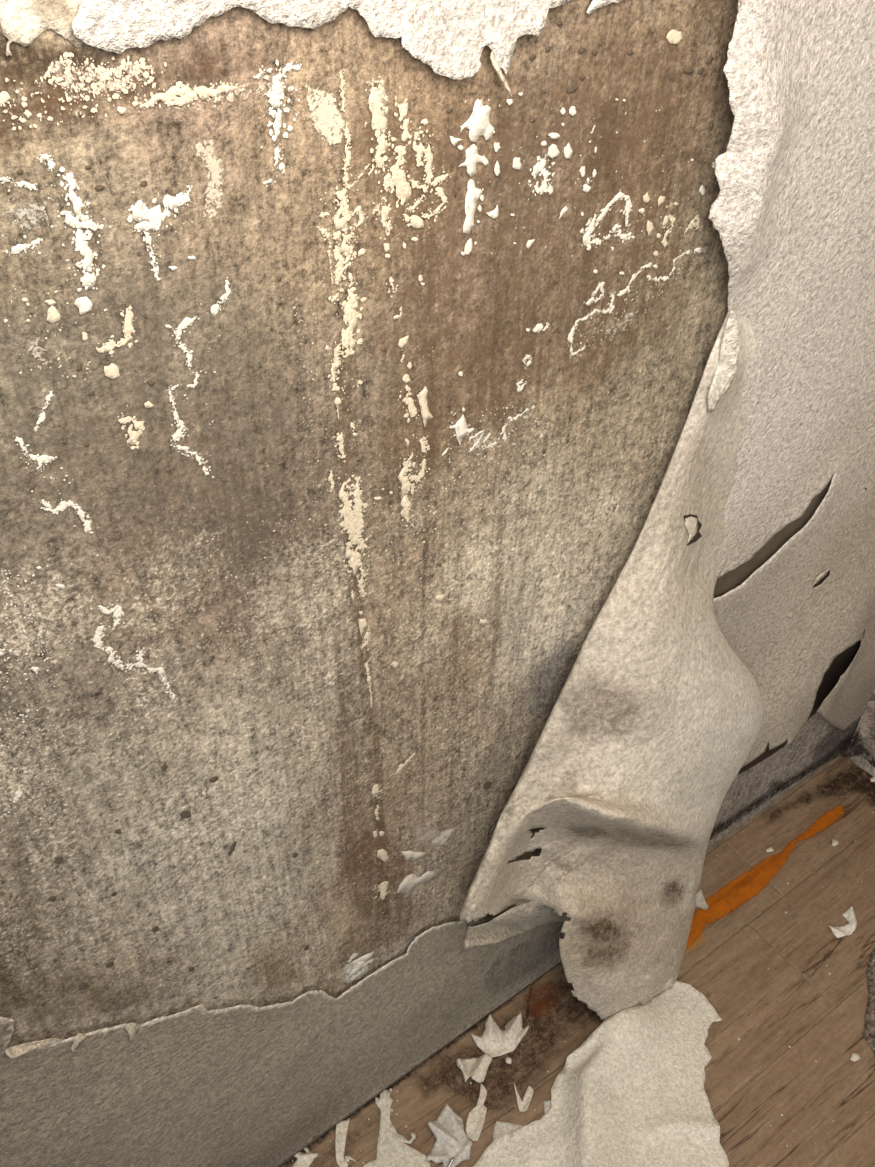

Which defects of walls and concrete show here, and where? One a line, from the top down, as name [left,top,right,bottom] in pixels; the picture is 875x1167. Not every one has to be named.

peeling [0,0,84,56]
leakage [0,38,156,136]
peeling [450,75,597,256]
peeling [40,154,99,315]
peeling [319,70,448,459]
leakage [365,22,694,468]
peeling [104,308,134,379]
peeling [165,317,209,475]
peeling [442,406,535,457]
peeling [41,499,91,532]
peeling [93,605,175,698]
leakage [580,918,627,959]